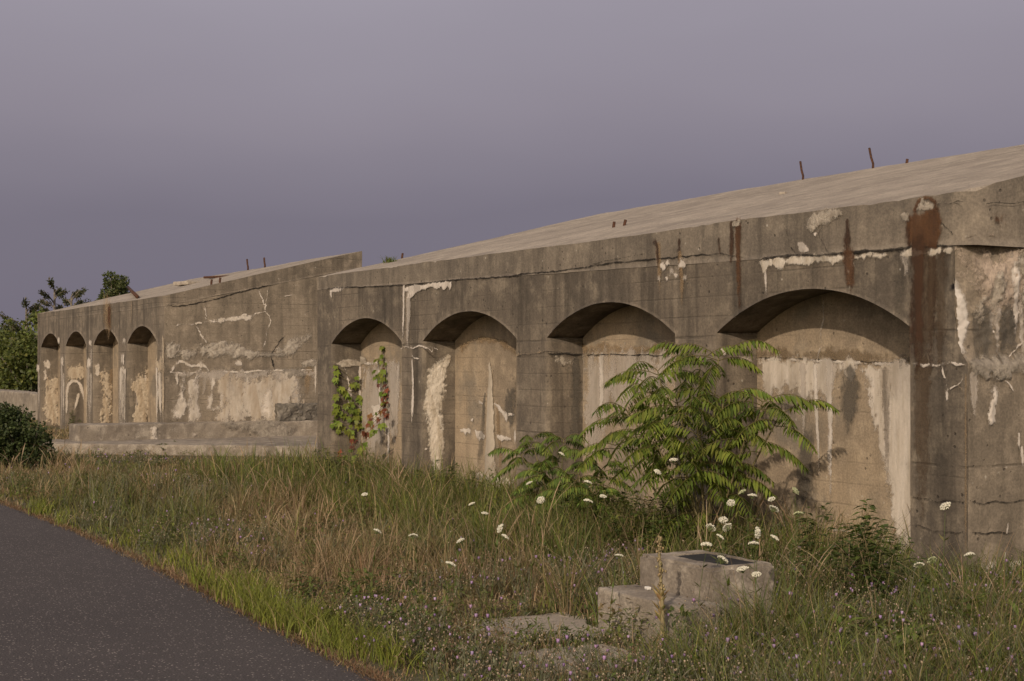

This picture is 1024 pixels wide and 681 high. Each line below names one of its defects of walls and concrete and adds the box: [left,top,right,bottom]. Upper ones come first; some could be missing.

crack [171,285,290,370]
crack [327,230,953,307]
corrosion [718,218,741,307]
spalling [798,208,842,252]
corrosion [843,219,854,291]
corrosion [906,207,945,422]
spalling [955,233,1024,391]
peeling [37,356,64,426]
peeling [87,341,148,423]
peeling [166,334,317,437]
peeling [423,354,451,475]
water stain [759,354,910,555]